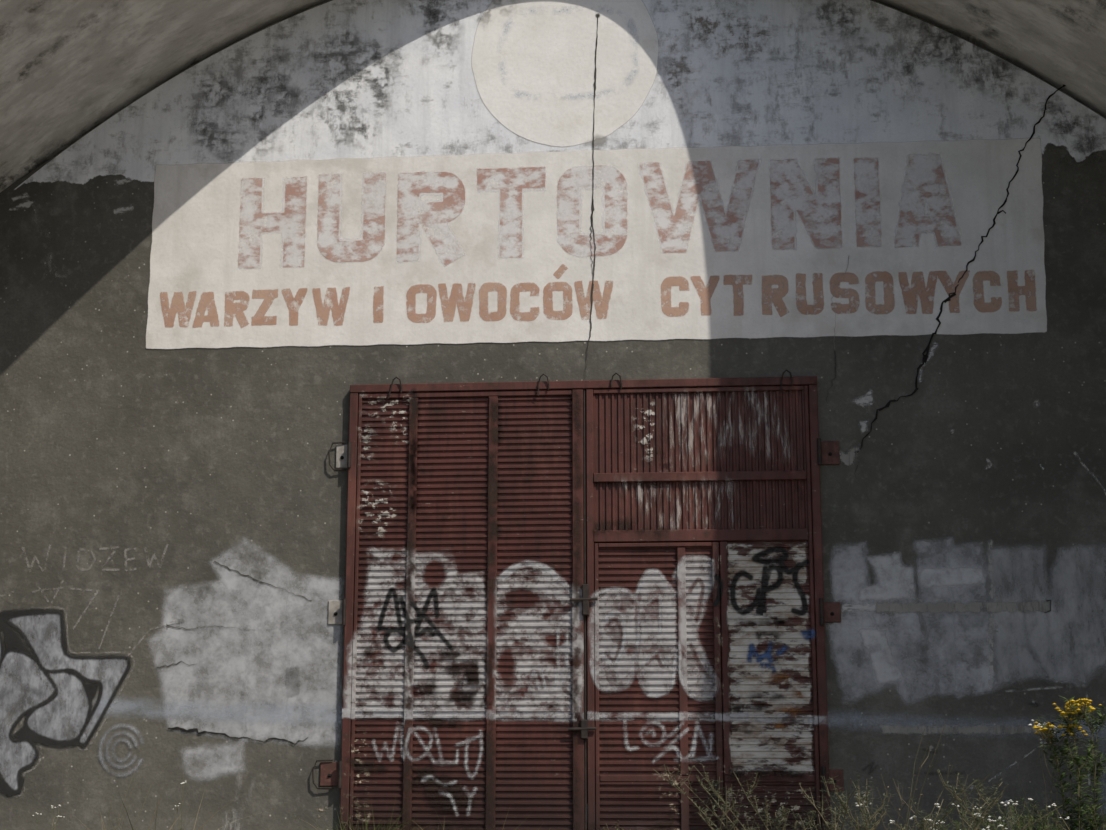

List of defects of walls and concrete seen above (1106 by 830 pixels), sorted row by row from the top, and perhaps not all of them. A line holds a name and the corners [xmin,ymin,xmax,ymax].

water stain [426,0,449,47]
water stain [690,10,765,52]
water stain [322,33,388,107]
water stain [668,57,691,87]
water stain [324,94,366,135]
crack [585,14,600,376]
crack [854,85,1066,479]
crack [168,727,308,745]